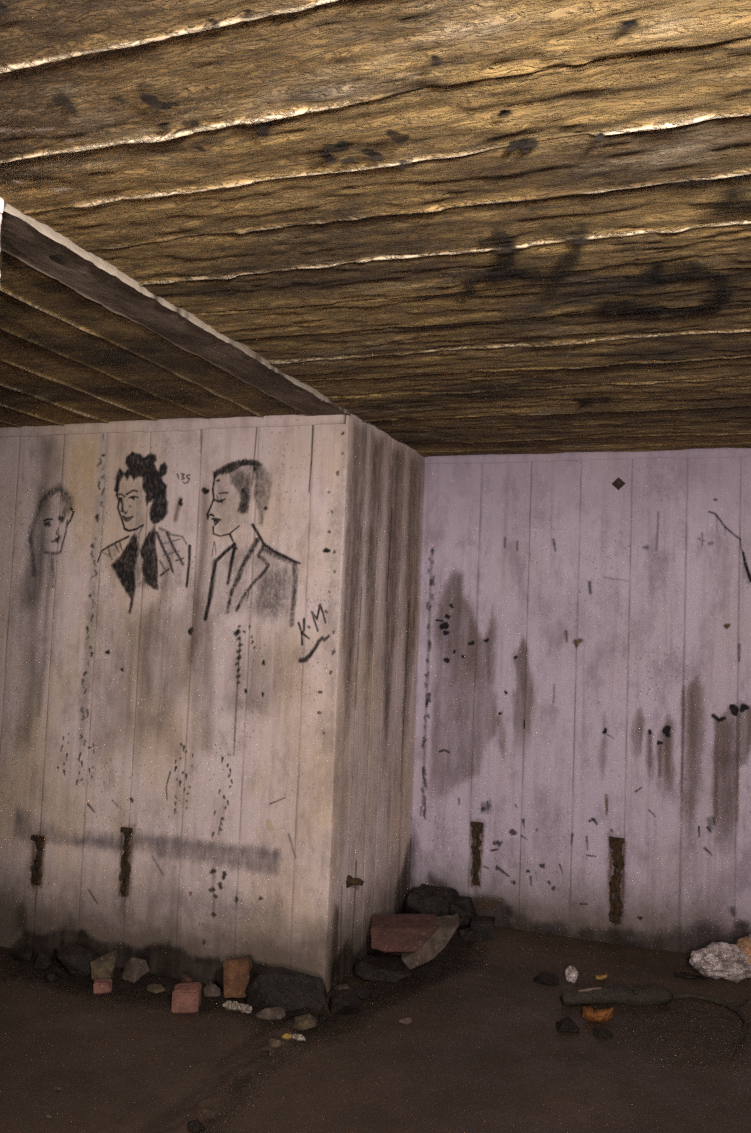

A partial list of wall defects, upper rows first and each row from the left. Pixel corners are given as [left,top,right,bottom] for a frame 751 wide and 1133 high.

damp [348,530,374,682]
damp [436,604,453,635]
damp [641,724,671,751]
damp [712,704,751,752]
corrosion [31,835,45,886]
corrosion [119,827,133,897]
corrosion [471,821,484,886]
corrosion [608,837,625,924]
damp [331,912,379,989]